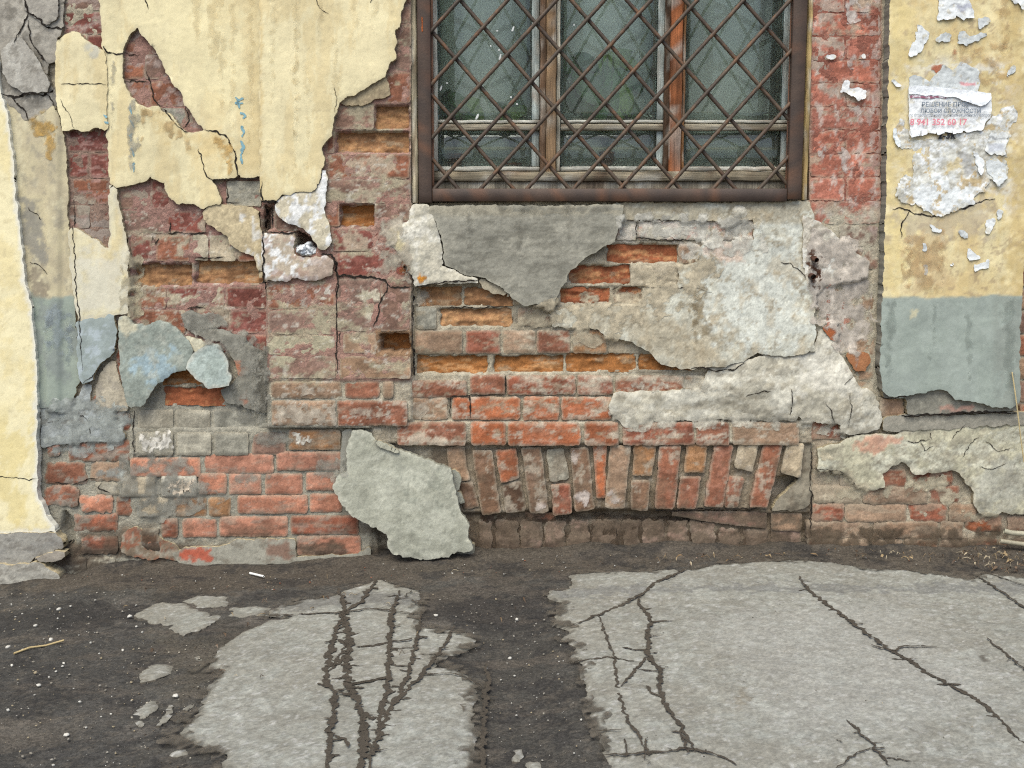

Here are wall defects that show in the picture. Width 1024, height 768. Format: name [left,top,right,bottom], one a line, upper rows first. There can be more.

crack [14,0,68,63]
crack [72,199,96,383]
crack [1,46,296,298]
spalling [35,0,1024,571]